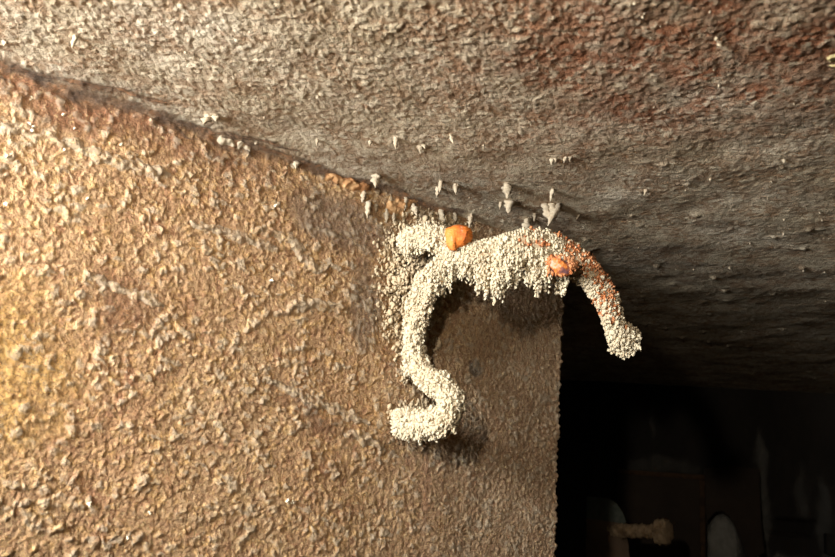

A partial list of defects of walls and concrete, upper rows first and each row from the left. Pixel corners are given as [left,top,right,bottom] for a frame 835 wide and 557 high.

damp [297,193,642,446]
rust [518,226,628,330]
efflorescence [708,517,737,557]